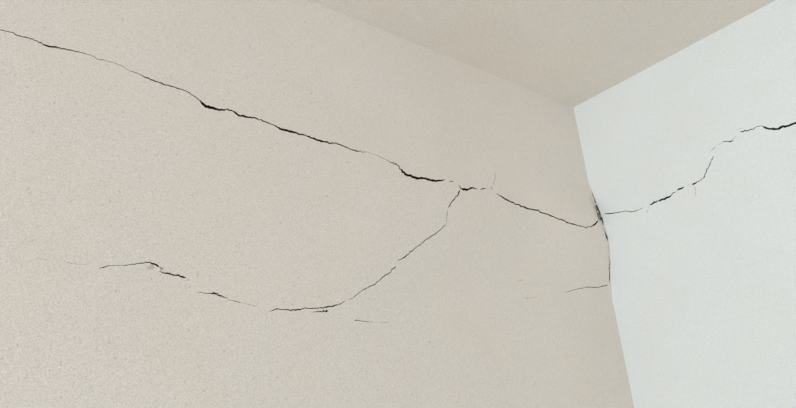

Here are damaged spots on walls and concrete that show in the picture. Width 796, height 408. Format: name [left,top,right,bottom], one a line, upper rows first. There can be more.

crack [2,30,796,312]